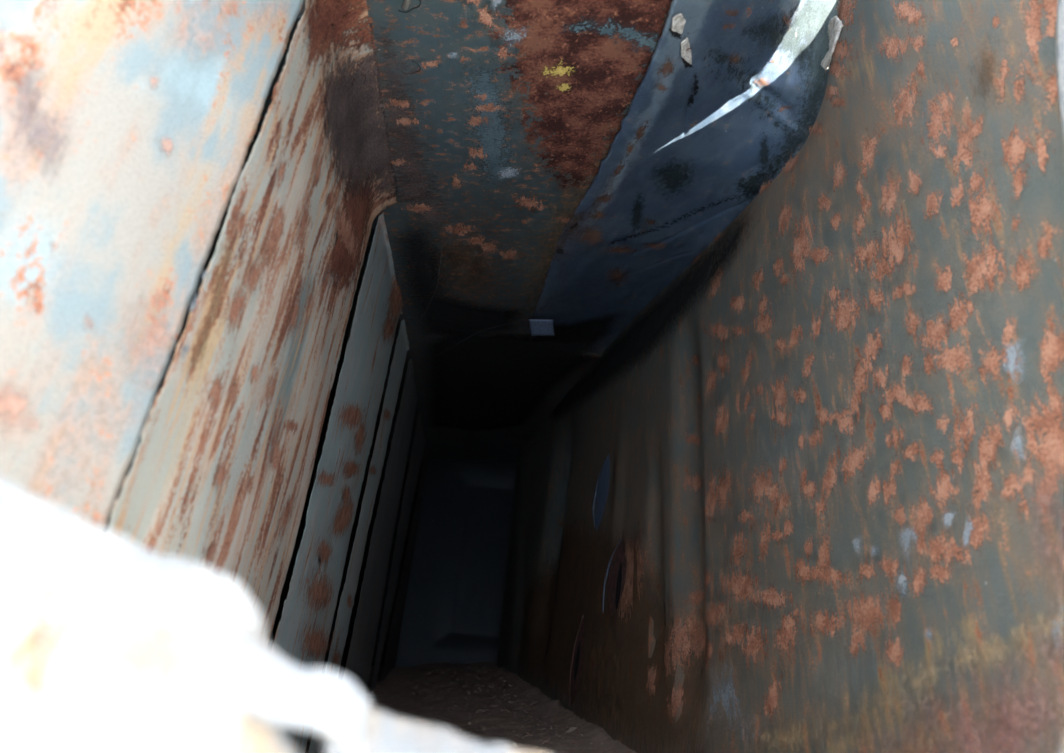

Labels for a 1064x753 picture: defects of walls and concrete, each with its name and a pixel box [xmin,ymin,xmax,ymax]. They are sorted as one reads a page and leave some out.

corrosion [467,0,693,193]
corrosion [224,0,419,335]
corrosion [451,146,488,187]
corrosion [509,195,544,225]
corrosion [443,223,520,262]
corrosion [207,364,279,415]
corrosion [519,0,1064,752]
corrosion [213,457,231,492]
corrosion [269,419,299,541]
corrosion [203,538,216,565]
corrosion [297,401,377,666]